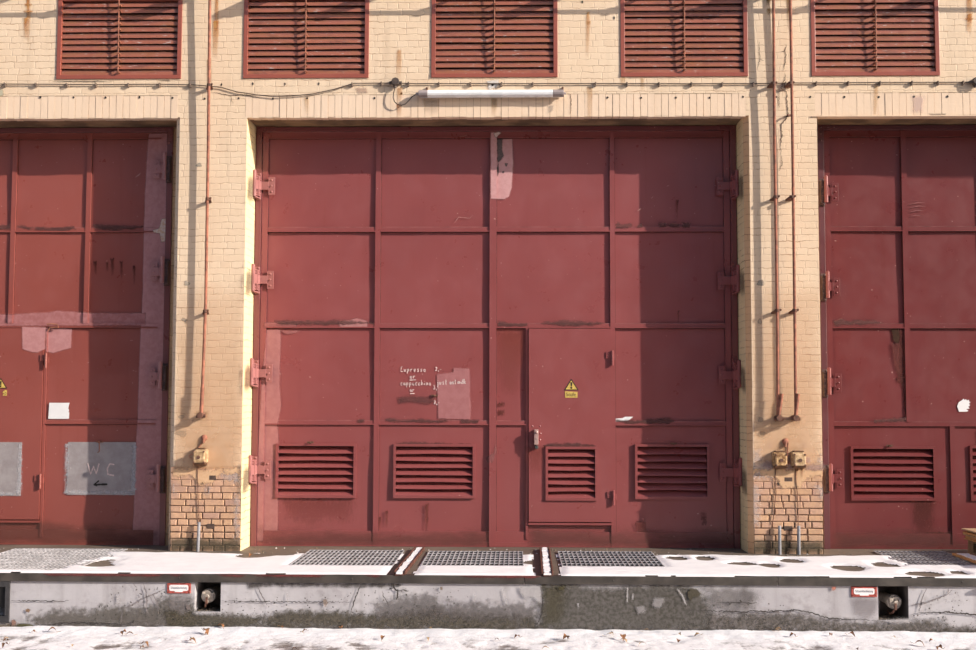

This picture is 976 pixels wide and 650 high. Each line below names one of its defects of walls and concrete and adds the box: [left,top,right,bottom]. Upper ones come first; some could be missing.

crack [758,46,789,171]
peeling [494,132,508,176]
crack [913,588,976,615]